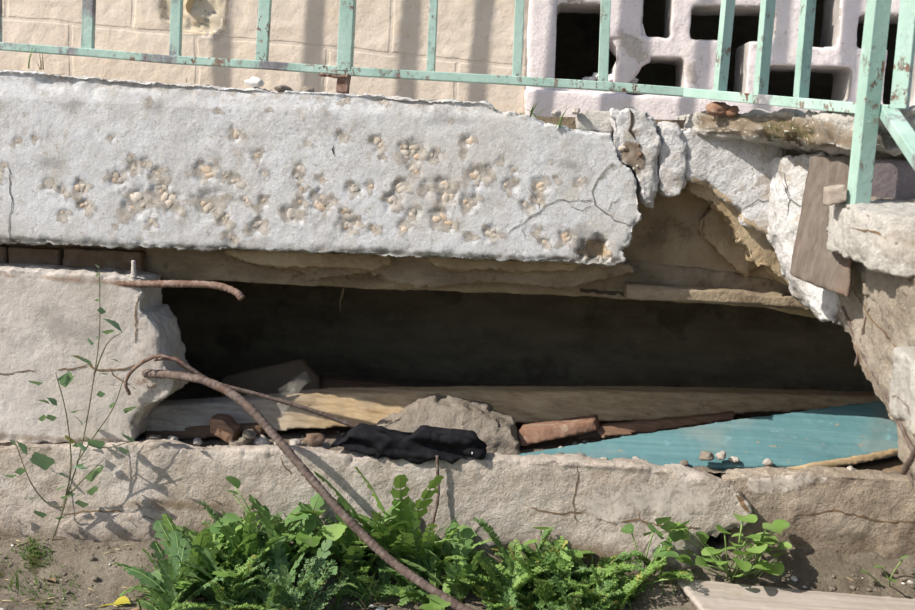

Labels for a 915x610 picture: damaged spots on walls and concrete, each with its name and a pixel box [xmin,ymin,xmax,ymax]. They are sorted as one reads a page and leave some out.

peeling [159,0,171,25]
peeling [182,0,228,35]
crack [6,167,14,236]
spalling [38,178,95,223]
spalling [102,153,270,244]
spalling [278,134,586,243]
crack [506,165,634,237]
spalling [530,224,612,259]
crack [58,297,149,389]
spalling [128,320,171,424]
crack [531,466,698,531]
crack [793,509,915,523]